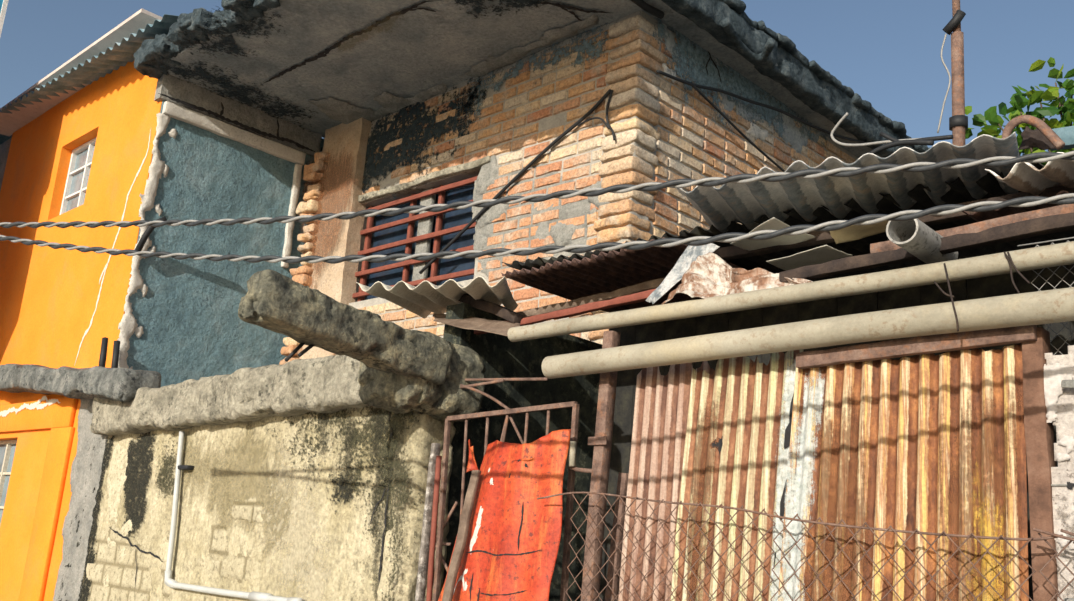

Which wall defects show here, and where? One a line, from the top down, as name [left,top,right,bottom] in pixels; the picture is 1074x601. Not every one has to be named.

crack [74,129,151,366]
peeling [117,113,178,369]
spalling [290,152,330,287]
crack [0,396,60,417]
damp [70,435,115,601]
crack [109,527,163,582]
damp [122,432,178,540]
spalling [279,337,303,365]
damp [326,412,355,514]
damp [369,406,396,597]
rust [804,383,869,601]
rust [937,390,1024,601]